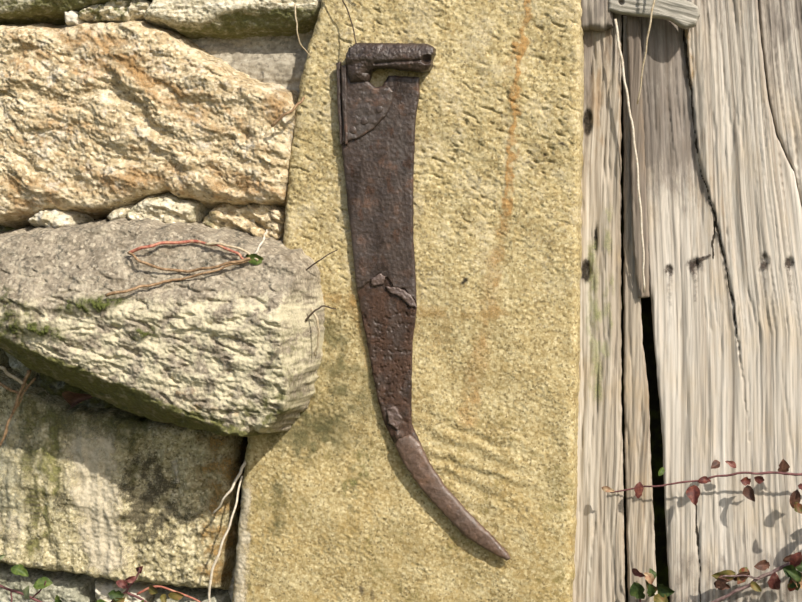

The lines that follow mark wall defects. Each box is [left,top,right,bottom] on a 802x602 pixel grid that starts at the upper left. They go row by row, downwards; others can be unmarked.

rust [500,0,532,217]
leakage [10,411,131,573]